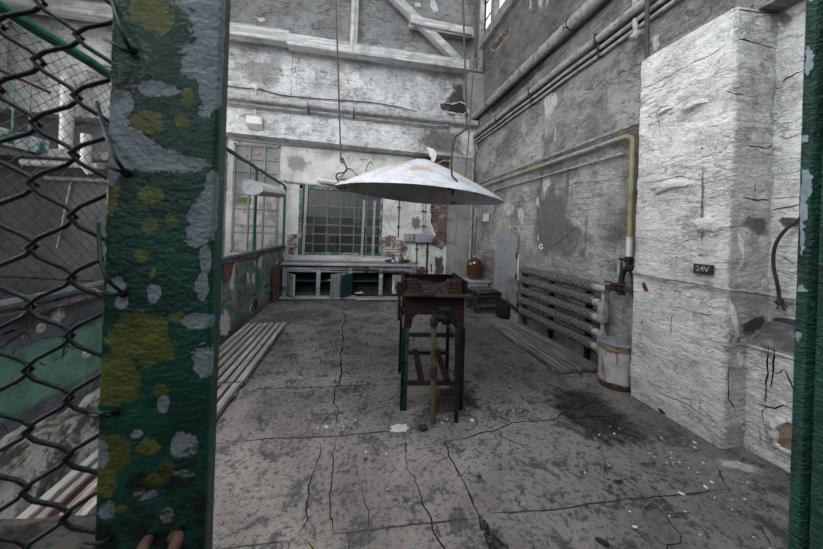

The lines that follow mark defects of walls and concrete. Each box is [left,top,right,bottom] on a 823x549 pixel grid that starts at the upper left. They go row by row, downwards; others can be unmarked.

spalling [437,101,469,115]
spalling [428,204,448,251]
peeling [228,261,237,292]
peeling [246,255,263,285]
peeling [219,308,231,338]
crack [759,346,793,423]
crack [288,313,349,549]
spalling [768,416,792,459]
crack [405,440,446,549]
crack [436,410,570,549]
crack [602,452,682,549]